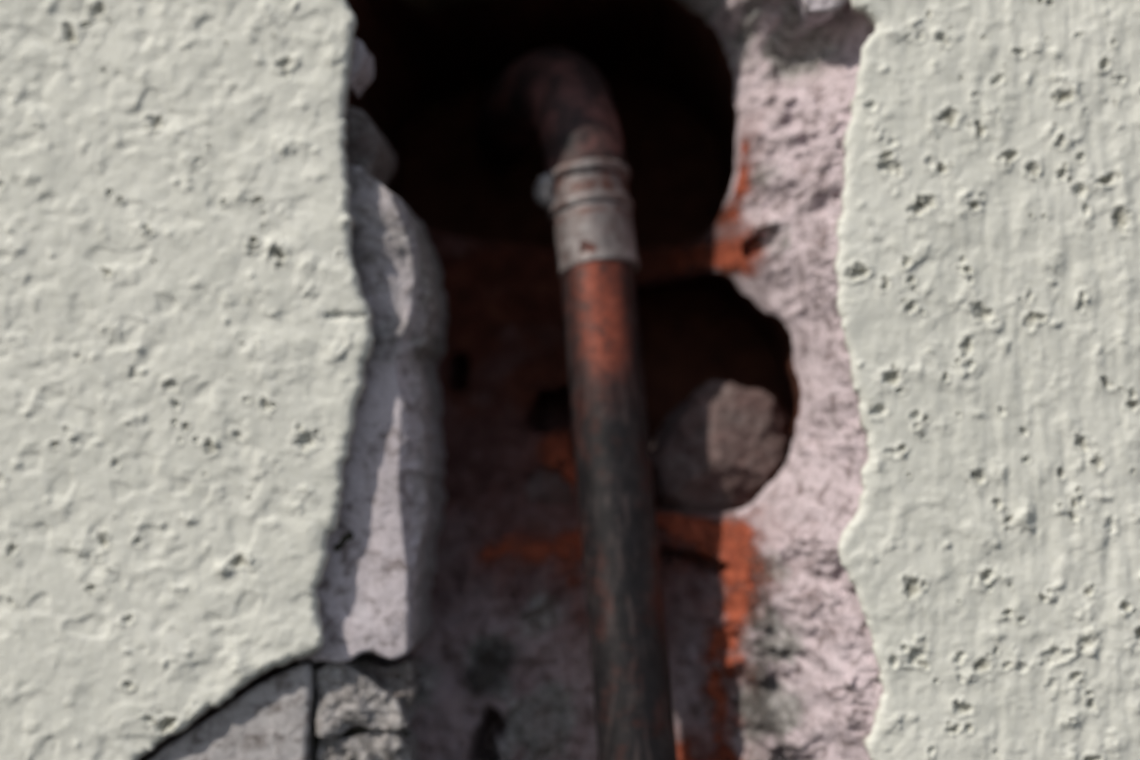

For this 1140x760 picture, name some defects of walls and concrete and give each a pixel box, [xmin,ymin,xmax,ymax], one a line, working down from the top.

crack [312,667,410,760]
spalling [139,37,598,760]
spalling [656,0,883,760]